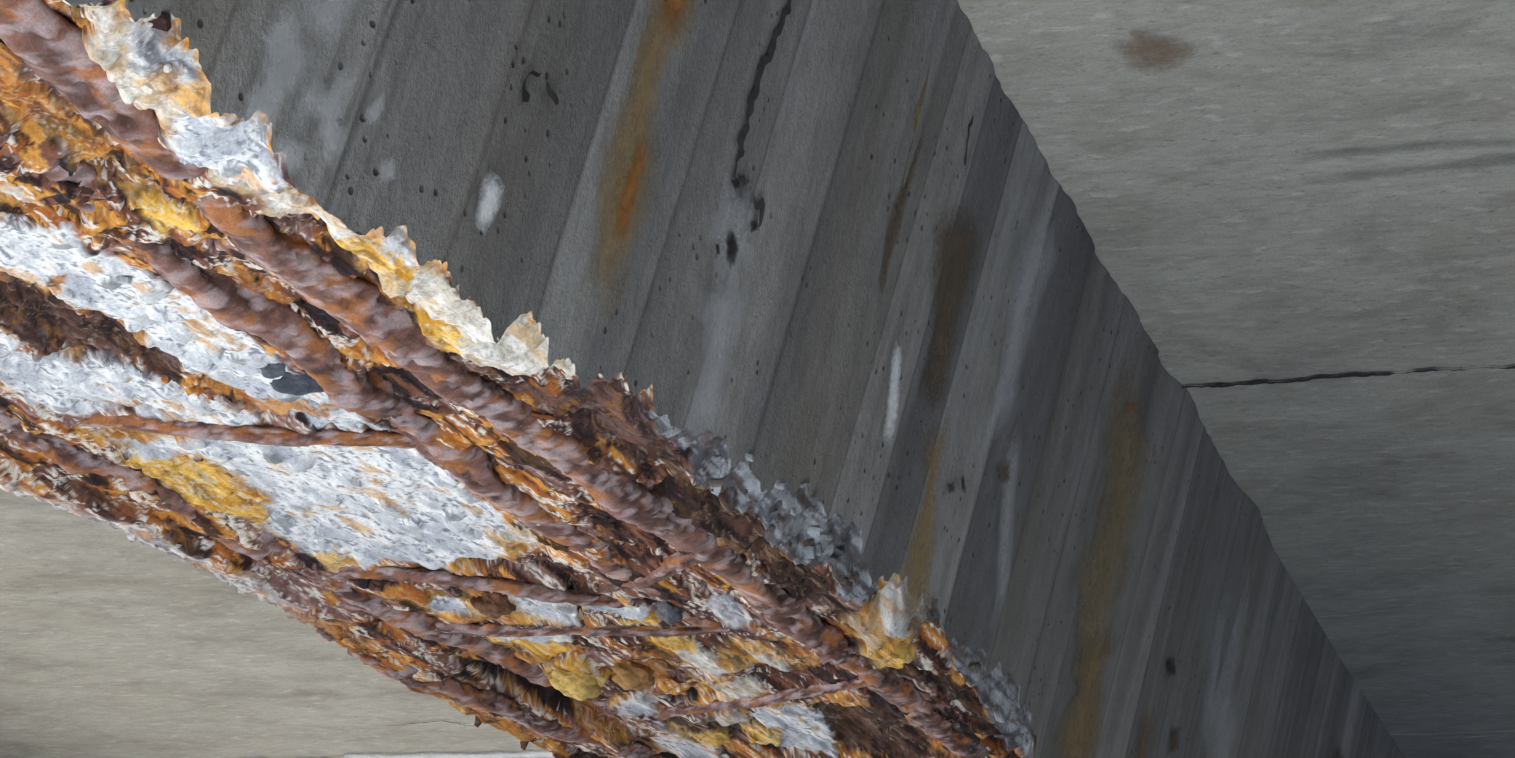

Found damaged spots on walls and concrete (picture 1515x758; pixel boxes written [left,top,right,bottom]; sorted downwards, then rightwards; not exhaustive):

crack [730,0,791,228]
rust [881,74,929,290]
spalling [0,0,1037,758]